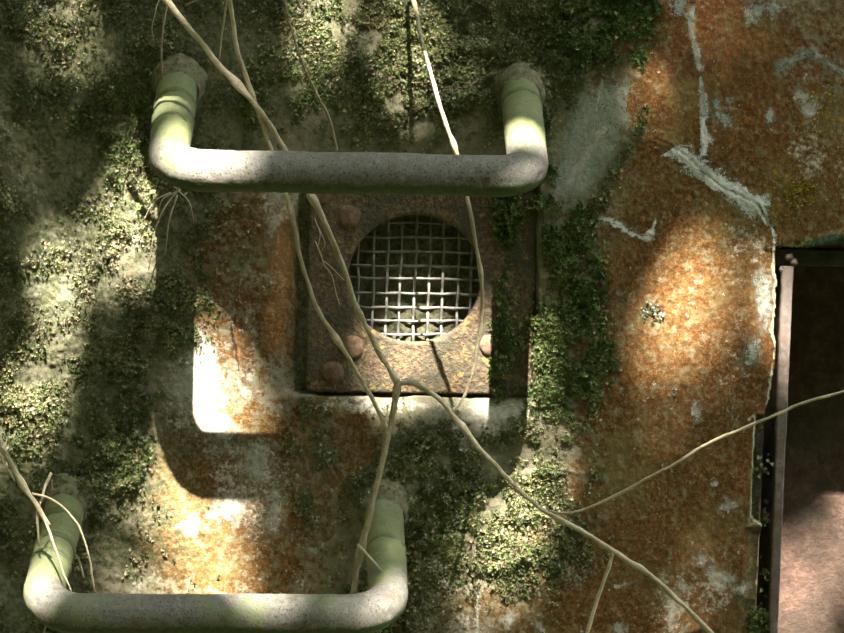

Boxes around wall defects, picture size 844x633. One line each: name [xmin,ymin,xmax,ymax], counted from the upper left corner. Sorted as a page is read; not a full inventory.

crack [660,94,777,244]